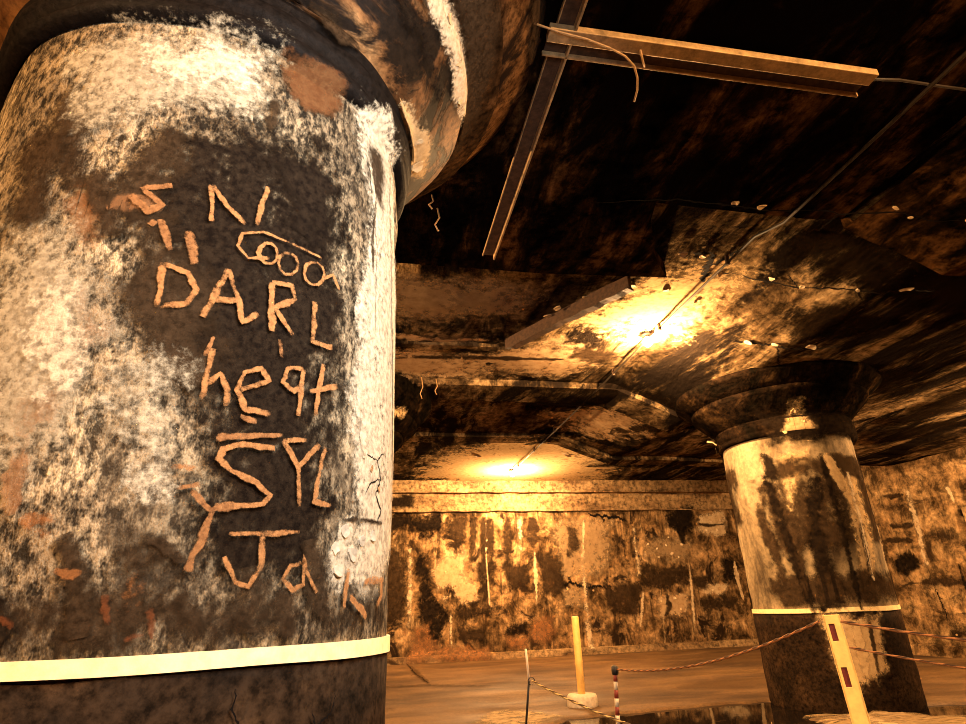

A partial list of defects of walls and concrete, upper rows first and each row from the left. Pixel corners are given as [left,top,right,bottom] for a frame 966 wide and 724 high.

water stain [0,17,436,660]
water stain [725,469,742,528]
water stain [446,514,539,606]
water stain [581,520,594,649]
water stain [733,561,752,606]
water stain [755,448,955,684]
water stain [921,564,966,590]